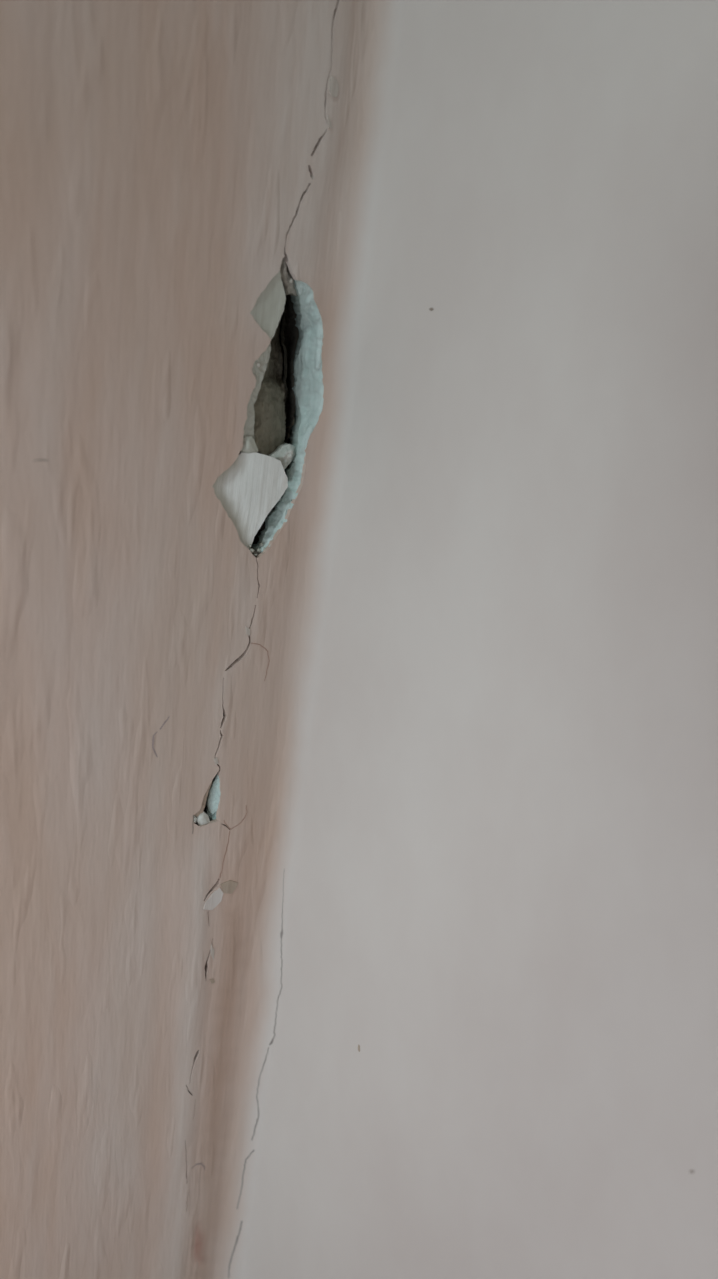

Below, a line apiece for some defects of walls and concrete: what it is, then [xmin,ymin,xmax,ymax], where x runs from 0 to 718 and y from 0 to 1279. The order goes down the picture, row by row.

flaking render [212,258,324,556]
flaking render [192,773,221,834]
crack [204,805,247,910]
crack [228,874,284,1278]